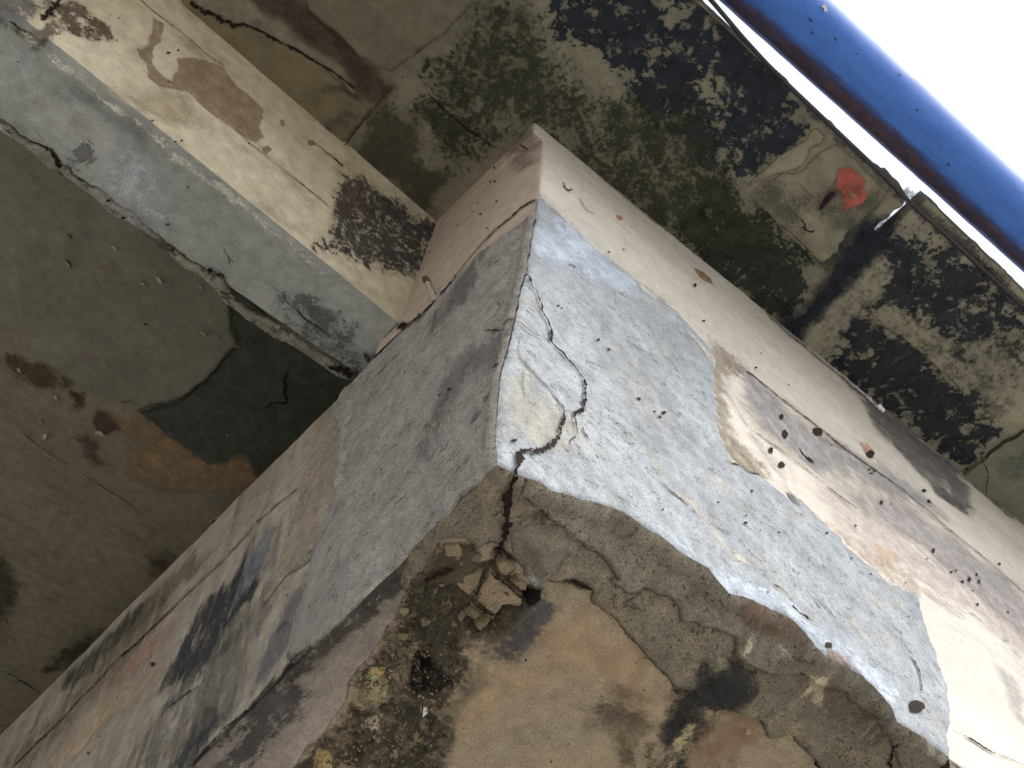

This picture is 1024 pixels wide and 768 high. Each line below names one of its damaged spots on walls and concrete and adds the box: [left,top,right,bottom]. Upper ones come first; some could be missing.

crack [29,141,62,169]
crack [190,1,361,95]
corrosion [725,0,1024,269]
crack [328,365,353,379]
crack [472,274,592,616]
damp [252,0,1024,648]
peeling [711,338,770,479]
damp [6,555,201,768]
damp [128,527,311,768]
damp [294,588,484,768]
spalling [825,642,856,671]
spalling [909,689,925,713]